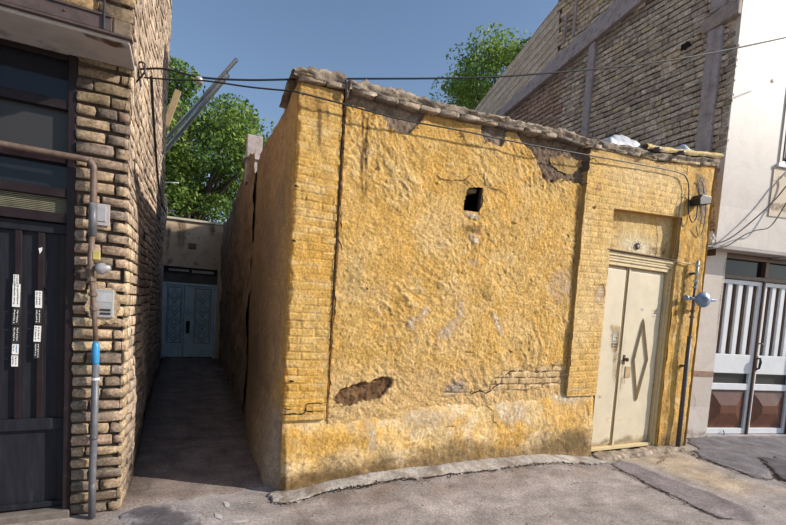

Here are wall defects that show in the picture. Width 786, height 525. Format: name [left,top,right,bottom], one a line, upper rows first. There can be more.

spalling [347,95,426,134]
damp [361,111,369,189]
spalling [481,125,506,146]
spalling [517,133,601,190]
crack [435,171,507,197]
crack [283,89,347,415]
spalling [333,377,395,407]
damp [285,465,397,488]